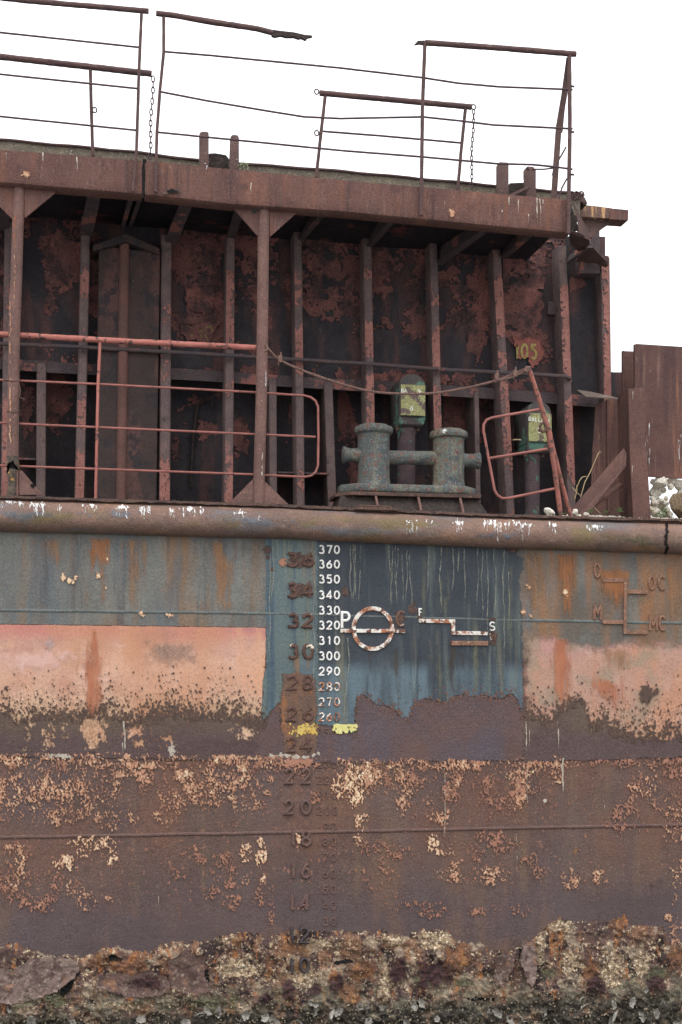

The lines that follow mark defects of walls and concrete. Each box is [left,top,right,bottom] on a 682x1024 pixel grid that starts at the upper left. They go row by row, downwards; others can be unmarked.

crack [662,523,670,554]
corrosion [86,633,100,712]
corrosion [554,640,571,700]
corrosion [640,684,659,705]
peeling [0,644,682,929]
corrosion [0,914,682,1024]